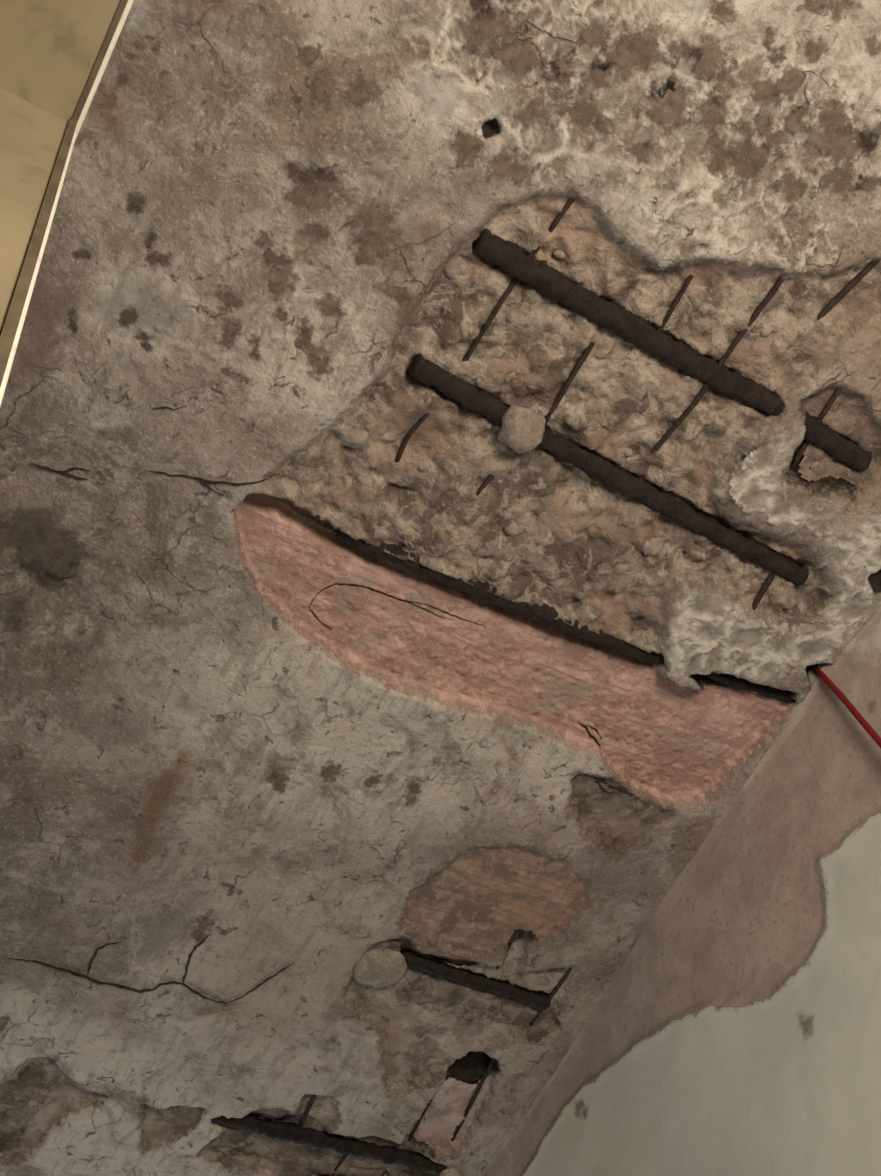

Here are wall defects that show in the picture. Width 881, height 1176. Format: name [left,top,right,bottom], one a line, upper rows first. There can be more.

peeling [461,0,543,75]
peeling [298,46,336,107]
peeling [345,75,378,107]
peeling [285,161,343,208]
peeling [451,130,540,184]
peeling [212,291,243,350]
peeling [249,335,260,361]
spalling [256,190,881,666]
peeling [138,608,881,1176]
crack [8,933,295,1004]
flaking render [0,1057,108,1163]